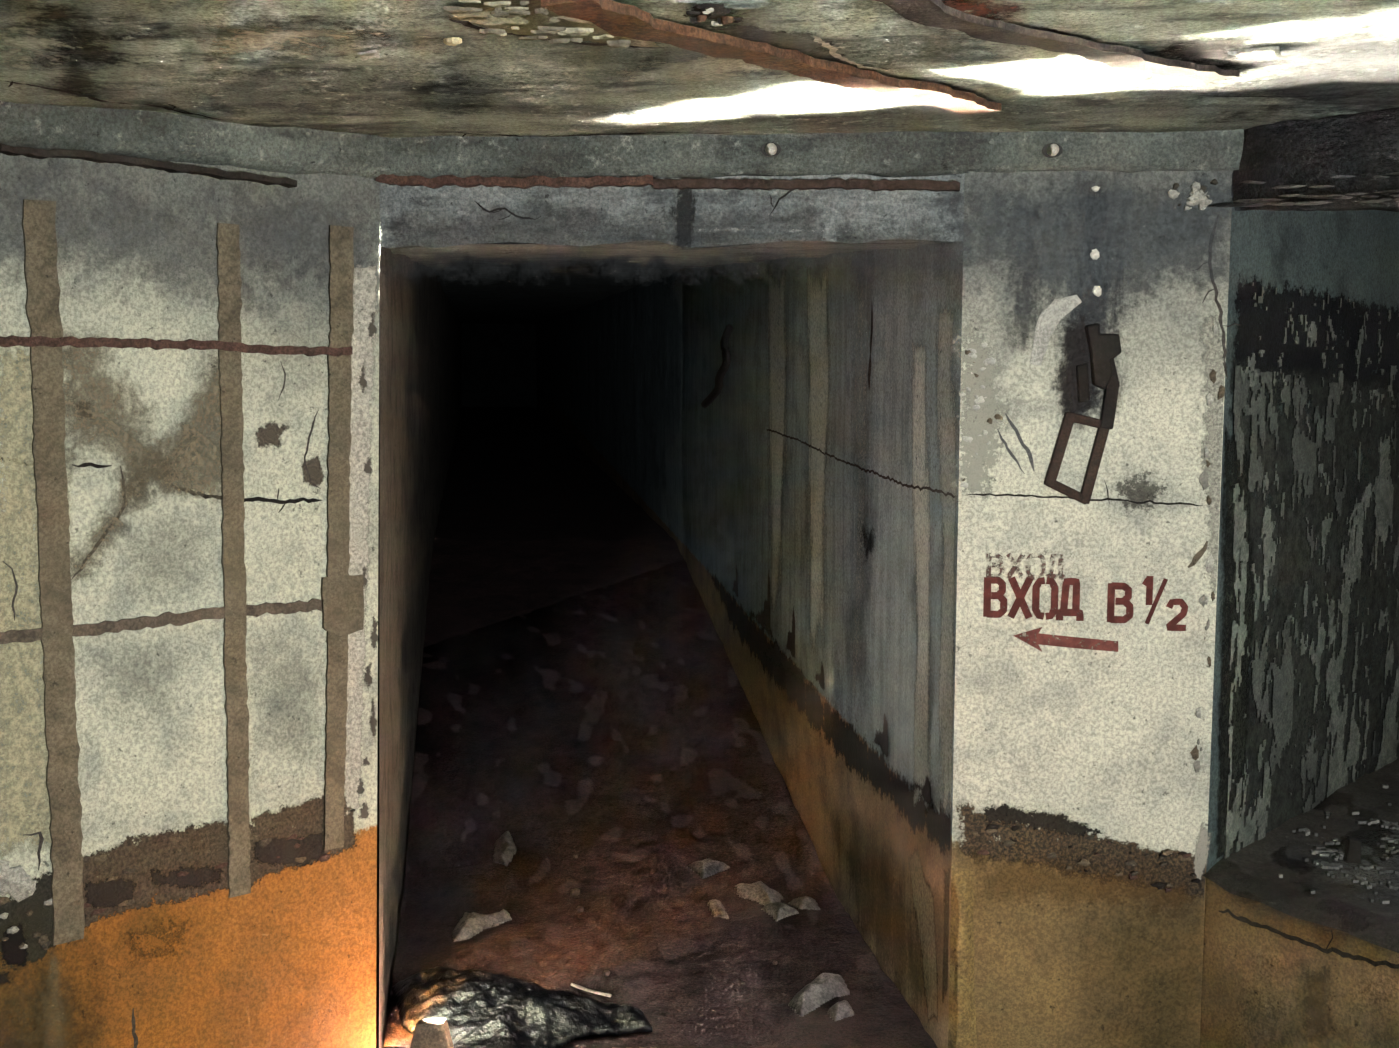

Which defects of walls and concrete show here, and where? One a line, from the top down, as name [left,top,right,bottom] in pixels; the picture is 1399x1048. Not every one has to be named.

spalling [443,0,660,48]
rust [942,0,1024,24]
crack [767,429,1201,506]
peeling [249,264,379,887]
peeling [706,275,1399,904]
spalling [0,821,229,985]
crack [1219,909,1399,969]